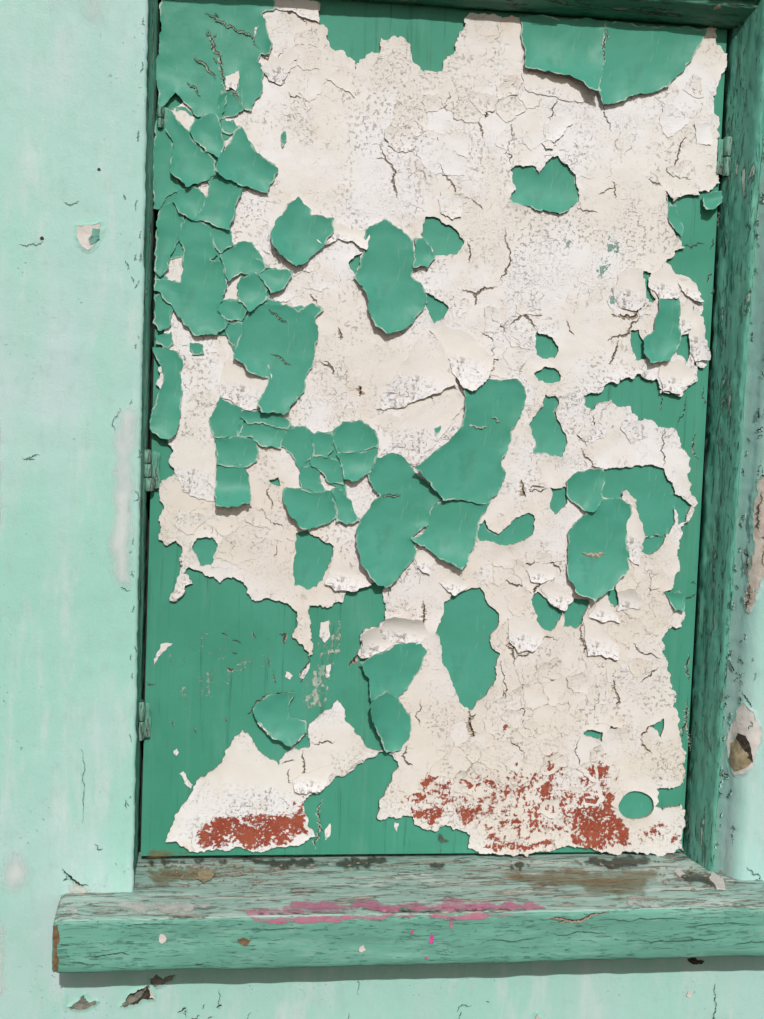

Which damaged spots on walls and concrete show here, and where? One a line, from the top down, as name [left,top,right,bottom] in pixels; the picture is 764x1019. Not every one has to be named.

crack [187,12,300,104]
crack [377,147,398,196]
crack [462,230,537,378]
crack [608,304,649,364]
crack [321,361,365,396]
peeling [150,0,727,857]
spalling [741,474,764,614]
spalling [723,701,764,778]
corrosion [196,796,308,850]
corrosion [396,753,680,852]
spalling [63,992,100,1013]
spalling [117,971,178,1011]